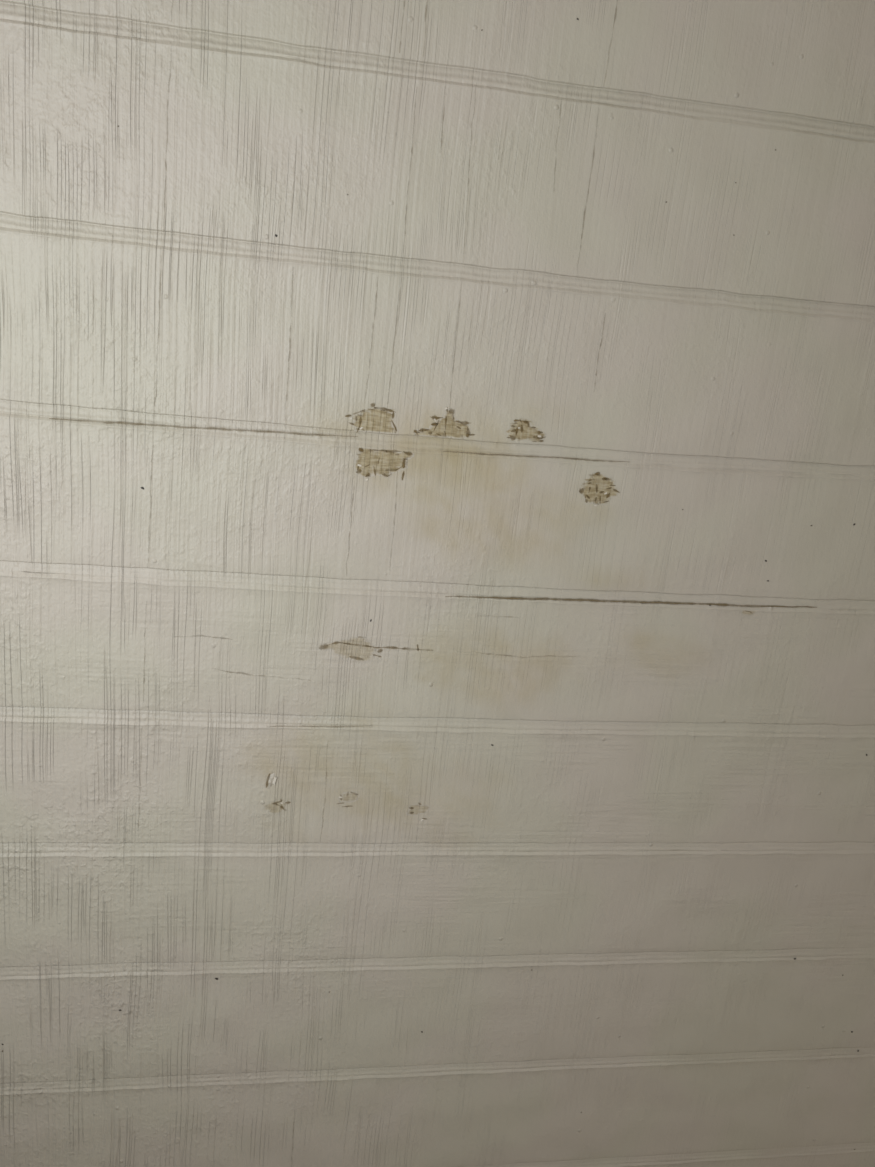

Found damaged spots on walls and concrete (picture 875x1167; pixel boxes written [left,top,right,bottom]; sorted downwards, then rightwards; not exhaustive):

peeling [345,404,399,434]
peeling [414,408,475,439]
peeling [505,417,546,443]
peeling [354,448,414,481]
peeling [578,472,620,506]
crack [445,596,815,608]
peeling [318,636,419,663]